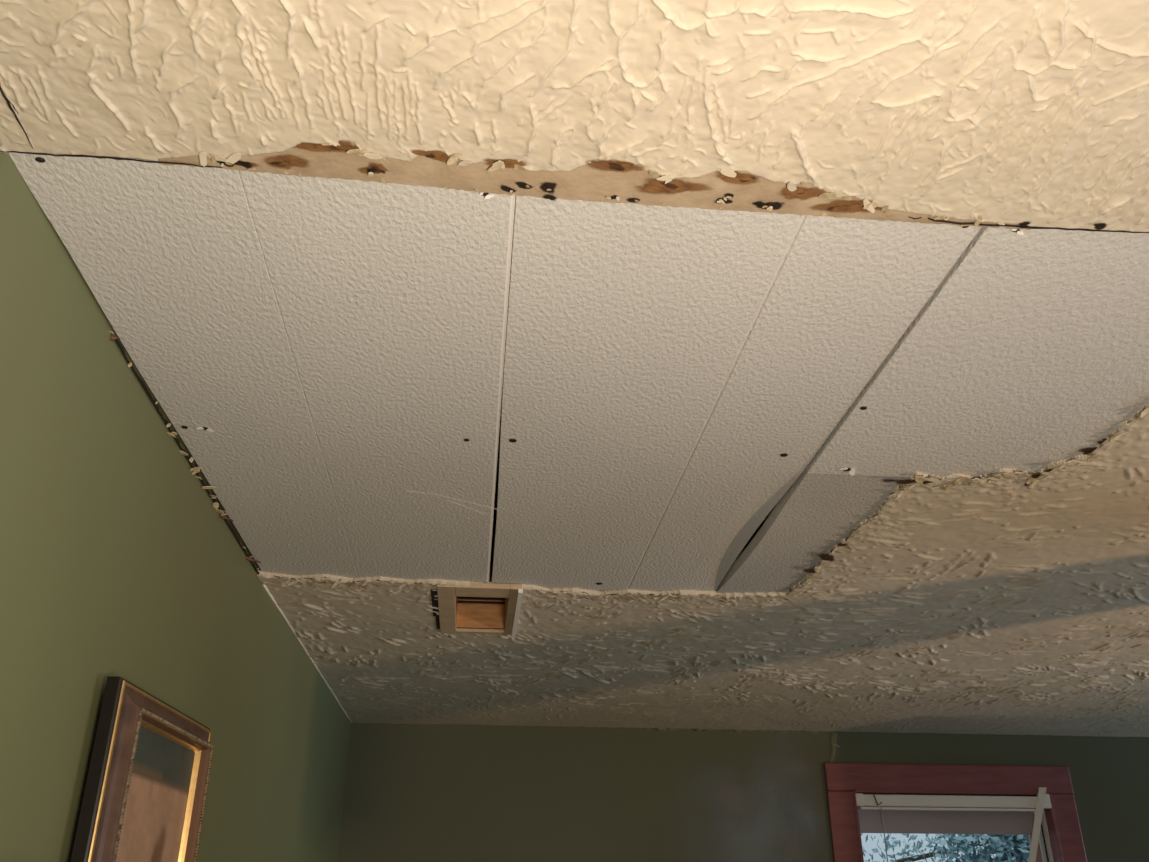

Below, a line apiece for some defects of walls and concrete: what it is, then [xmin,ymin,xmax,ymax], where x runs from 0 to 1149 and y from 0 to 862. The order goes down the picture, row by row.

peeling [158,142,1031,235]
spalling [882,433,1125,500]
spalling [804,543,851,584]